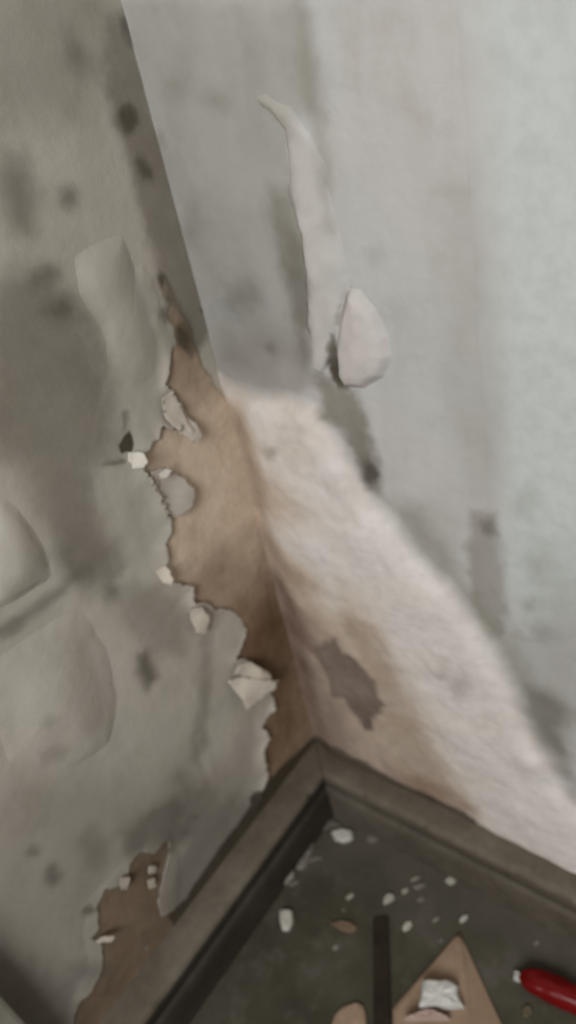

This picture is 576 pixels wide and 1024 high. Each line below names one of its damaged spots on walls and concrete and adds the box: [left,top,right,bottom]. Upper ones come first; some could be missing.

peeling [257,94,348,375]
spalling [88,263,316,808]
water stain [218,371,576,874]
spalling [67,827,181,1024]